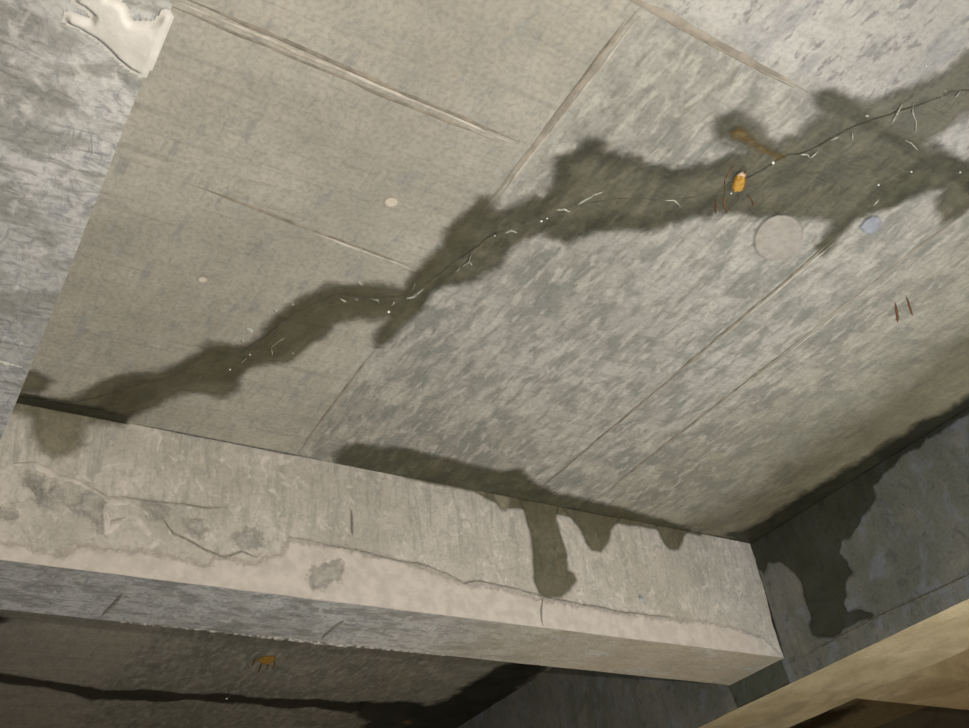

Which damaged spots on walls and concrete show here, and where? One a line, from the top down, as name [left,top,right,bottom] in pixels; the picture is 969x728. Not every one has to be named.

rust [715,166,755,214]
leakage [13,53,969,457]
spalling [23,471,106,533]
crack [122,496,264,558]
leakage [336,337,969,638]
spalling [310,560,344,590]
crack [290,511,670,625]
leakage [729,592,790,708]
leakage [357,663,546,728]
leakage [791,706,856,728]